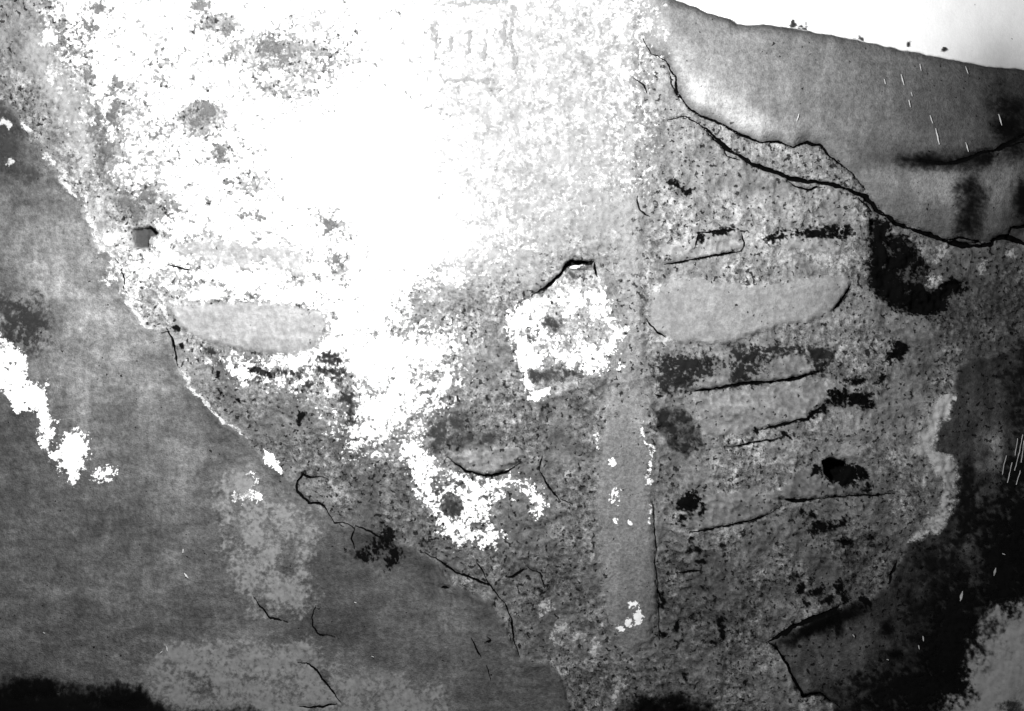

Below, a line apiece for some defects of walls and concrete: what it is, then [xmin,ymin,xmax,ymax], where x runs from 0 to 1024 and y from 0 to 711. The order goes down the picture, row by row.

crack [633,38,1024,248]
crack [666,229,745,264]
crack [531,259,598,296]
water stain [901,243,966,315]
flaking render [172,275,365,359]
flaking render [514,266,624,402]
crack [654,371,819,397]
flaking render [739,345,818,382]
water stain [728,342,841,382]
flaking render [452,447,526,474]
water stain [821,327,1024,711]
water stain [780,602,863,647]